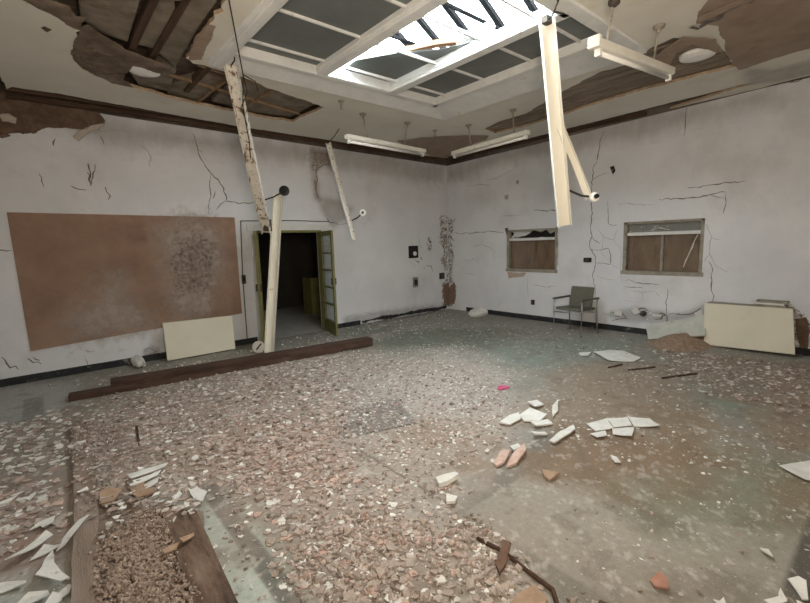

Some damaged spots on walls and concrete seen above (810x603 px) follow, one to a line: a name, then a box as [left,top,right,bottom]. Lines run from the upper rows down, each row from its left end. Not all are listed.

flaking render [23,0,171,88]
flaking render [189,25,215,60]
flaking render [655,0,810,70]
crack [71,163,111,200]
crack [193,134,253,213]
flaking render [427,215,456,307]
crack [589,132,742,313]